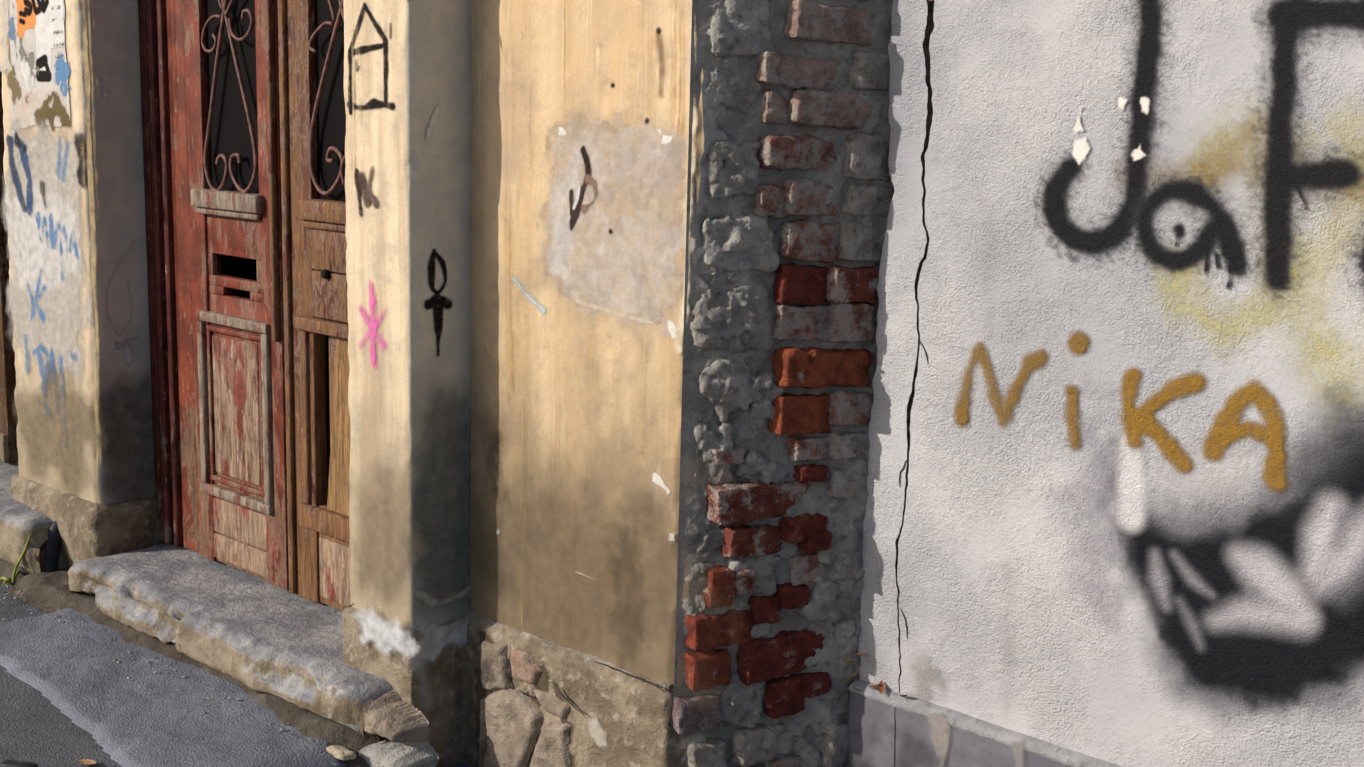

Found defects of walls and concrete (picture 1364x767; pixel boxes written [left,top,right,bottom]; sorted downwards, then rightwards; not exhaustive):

peeling [1118,97,1149,114]
peeling [1072,107,1090,164]
peeling [1131,146,1145,161]
spalling [543,0,895,767]
crack [894,0,935,767]